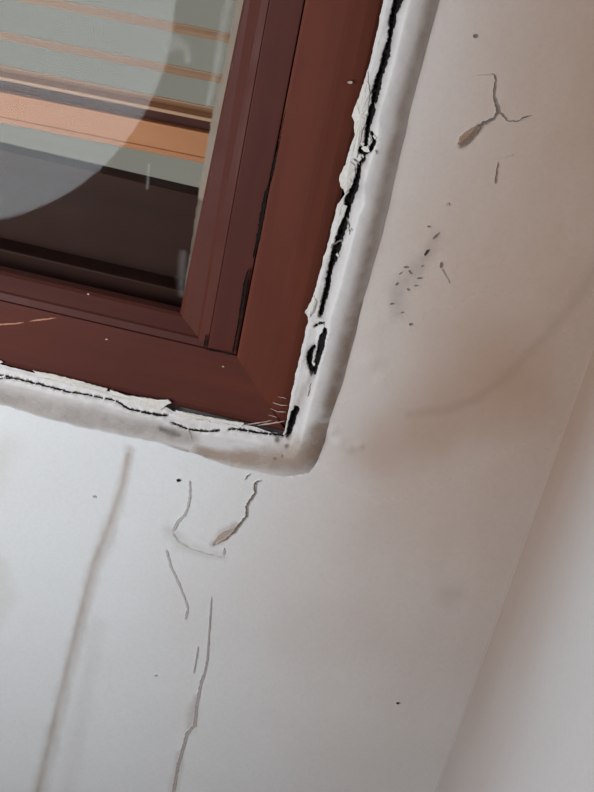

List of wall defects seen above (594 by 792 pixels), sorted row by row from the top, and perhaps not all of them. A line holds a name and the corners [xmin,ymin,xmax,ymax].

peeling [339,72,370,193]
crack [457,74,532,147]
peeling [305,296,317,318]
peeling [33,370,244,426]
crack [165,473,261,620]
crack [171,598,212,792]